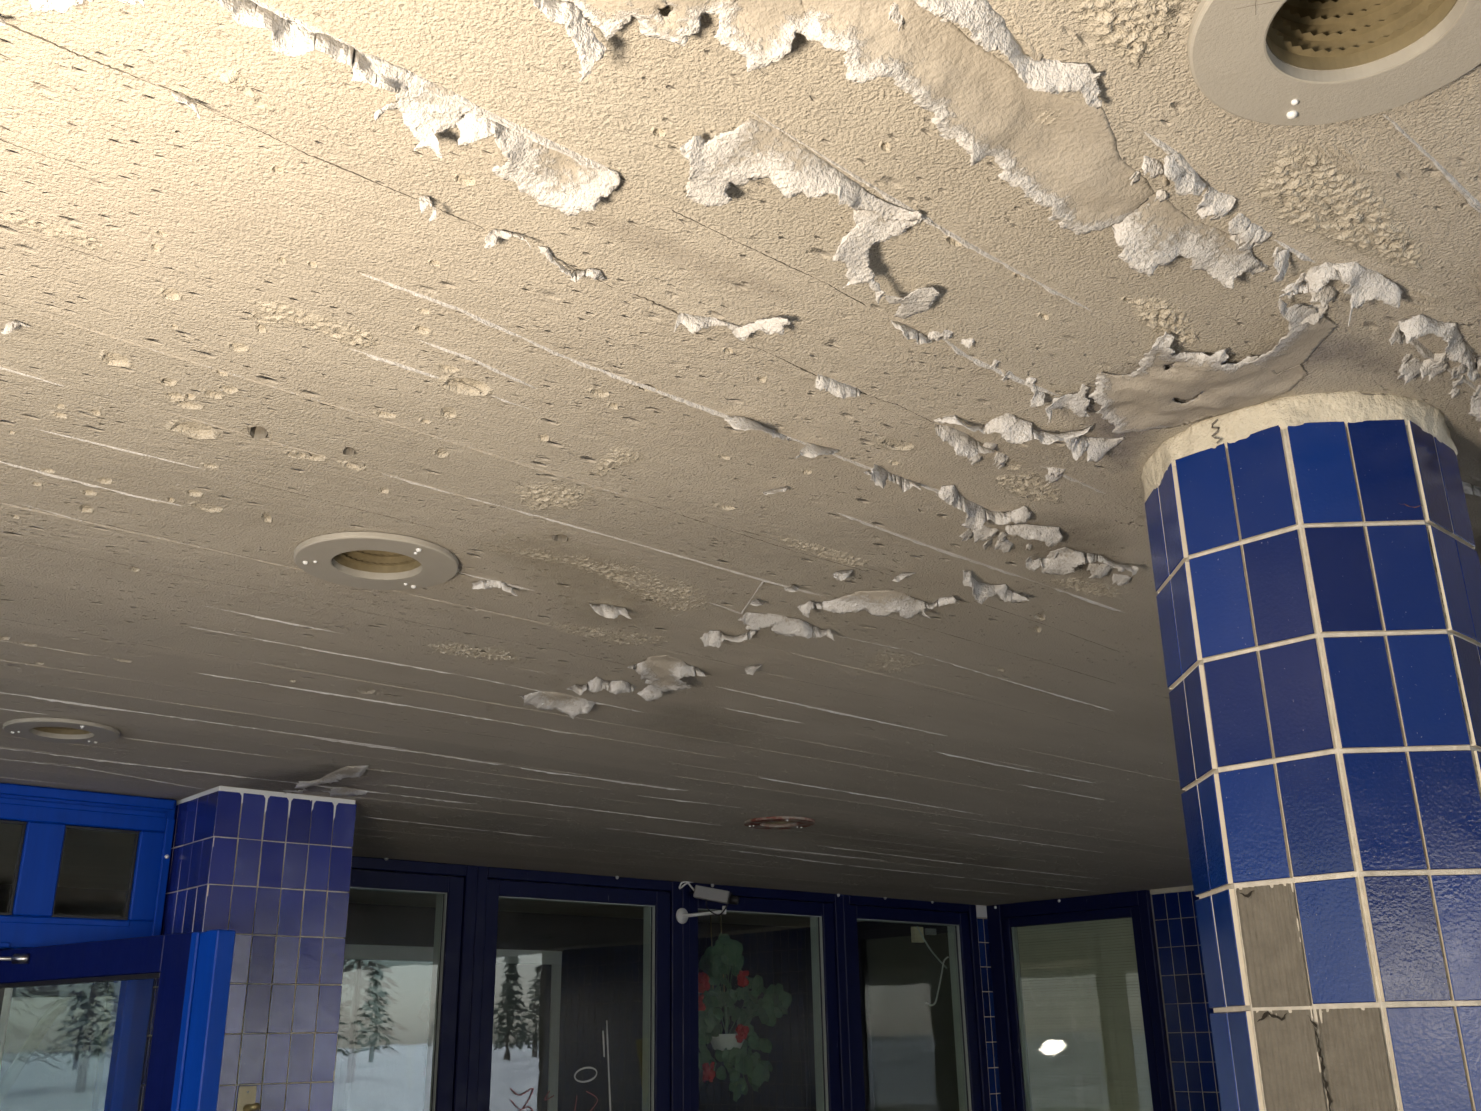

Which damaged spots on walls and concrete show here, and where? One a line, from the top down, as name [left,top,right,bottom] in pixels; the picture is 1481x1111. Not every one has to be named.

peeling [208,0,620,216]
peeling [419,196,437,222]
peeling [484,230,605,283]
spalling [226,298,384,352]
peeling [532,0,1481,586]
spalling [157,370,239,440]
spalling [247,426,268,439]
spalling [418,363,494,425]
peeling [700,536,1047,648]
peeling [520,655,706,719]
peeling [283,765,369,796]
crack [1257,1011,1332,1111]